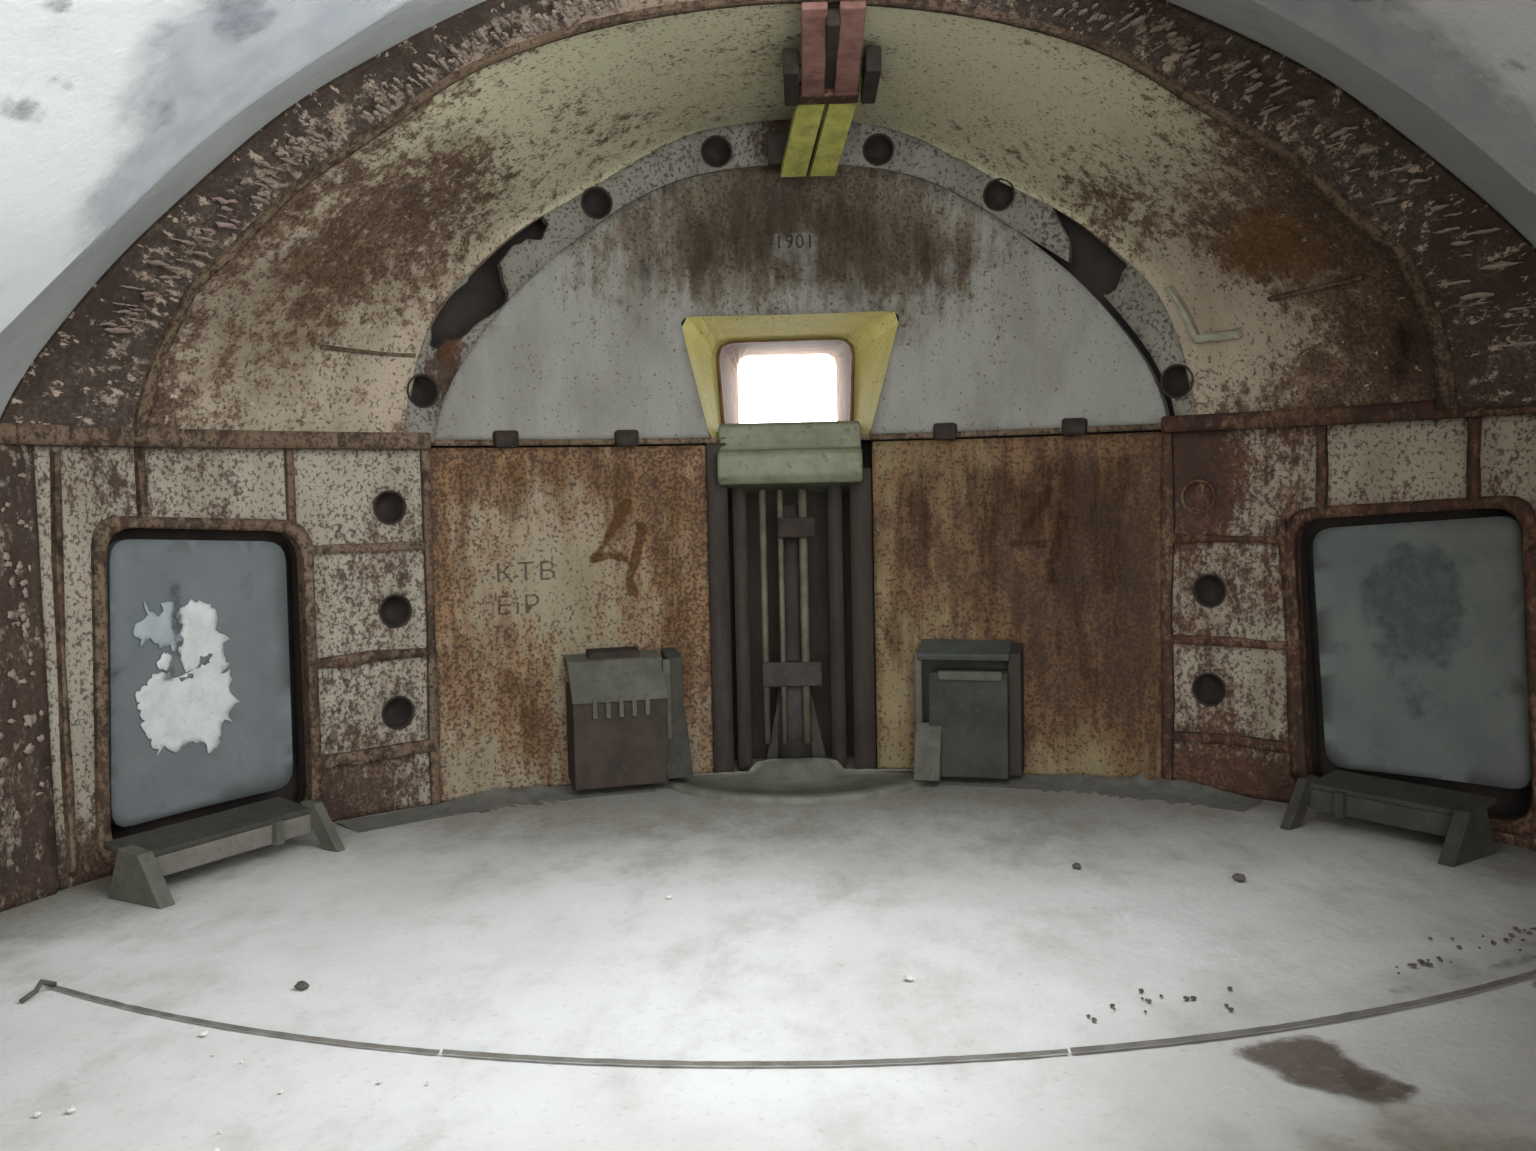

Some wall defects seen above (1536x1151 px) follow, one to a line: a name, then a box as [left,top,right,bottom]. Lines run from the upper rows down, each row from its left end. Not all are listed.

peeling [133,599,241,755]
water stain [1240,1036,1415,1102]